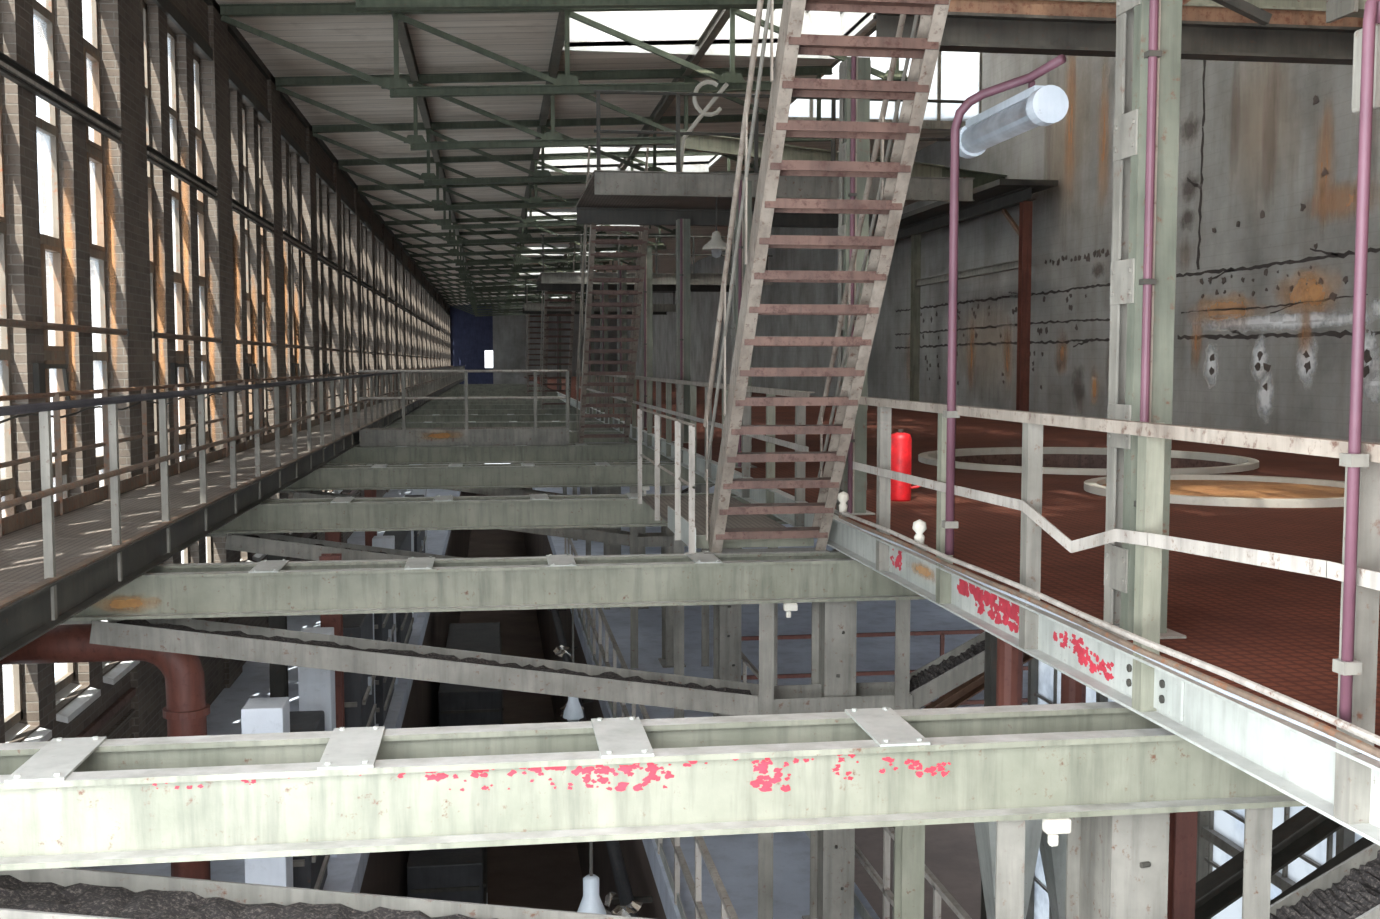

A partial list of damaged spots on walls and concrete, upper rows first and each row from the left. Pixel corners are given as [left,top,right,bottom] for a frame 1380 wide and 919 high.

rust [1209,302,1245,320]
crack [1176,60,1380,340]